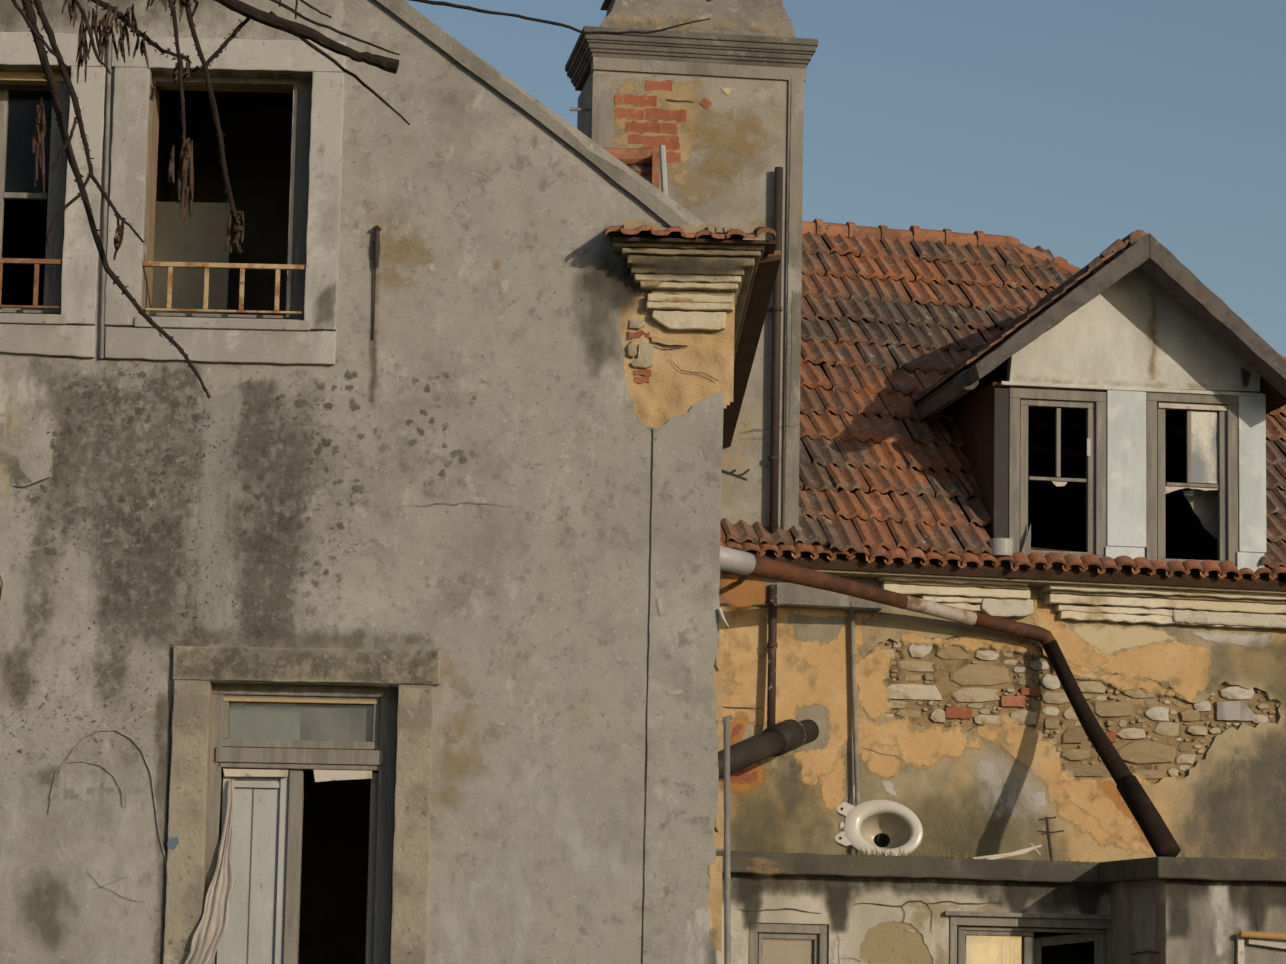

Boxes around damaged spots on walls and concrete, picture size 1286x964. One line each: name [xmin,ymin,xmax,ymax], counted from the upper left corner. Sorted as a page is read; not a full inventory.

spalling [612,80,708,186]
spalling [619,280,735,428]
leakage [0,357,435,691]
leakage [6,653,30,704]
spalling [713,599,1280,855]
leakage [1180,742,1286,860]
leakage [743,887,761,927]
leakage [828,888,847,931]
spalling [831,921,933,964]
leakage [1171,883,1190,936]